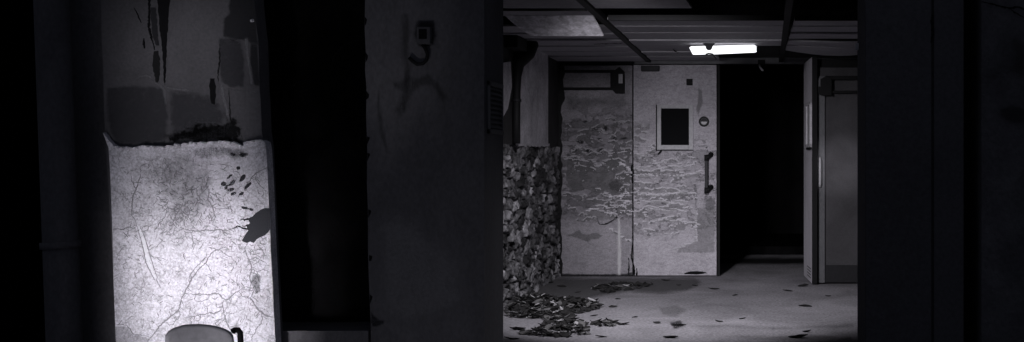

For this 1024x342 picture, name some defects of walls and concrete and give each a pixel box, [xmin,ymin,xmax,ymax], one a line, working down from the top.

crack [134,0,170,86]
crack [115,156,272,342]
peeling [562,117,702,250]